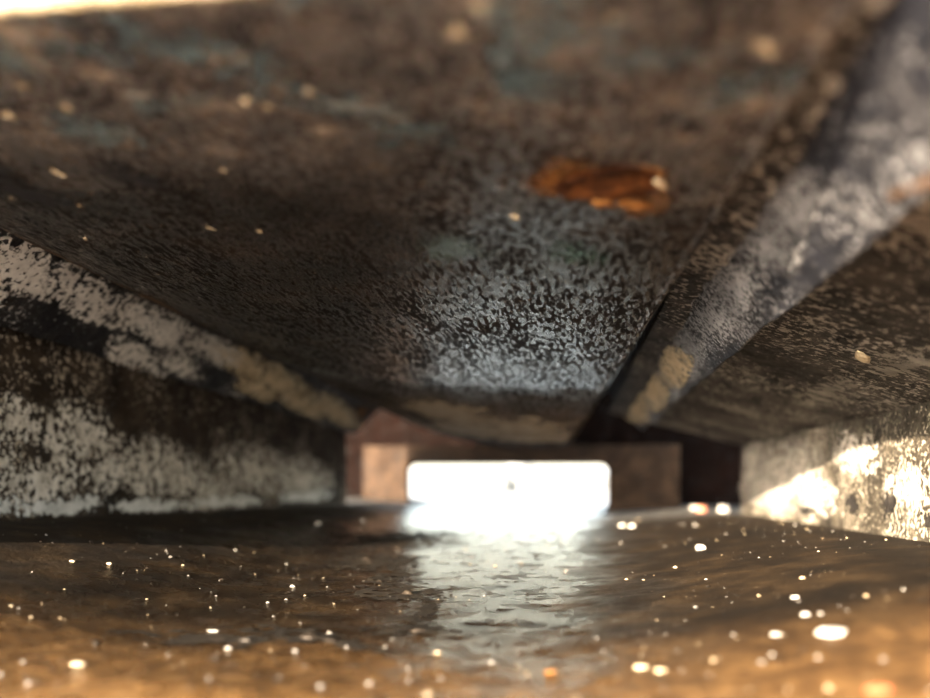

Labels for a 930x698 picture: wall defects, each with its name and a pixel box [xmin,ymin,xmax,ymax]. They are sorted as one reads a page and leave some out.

water stain [0,237,363,429]
water stain [0,392,335,517]
water stain [739,436,838,519]
water stain [833,430,930,512]